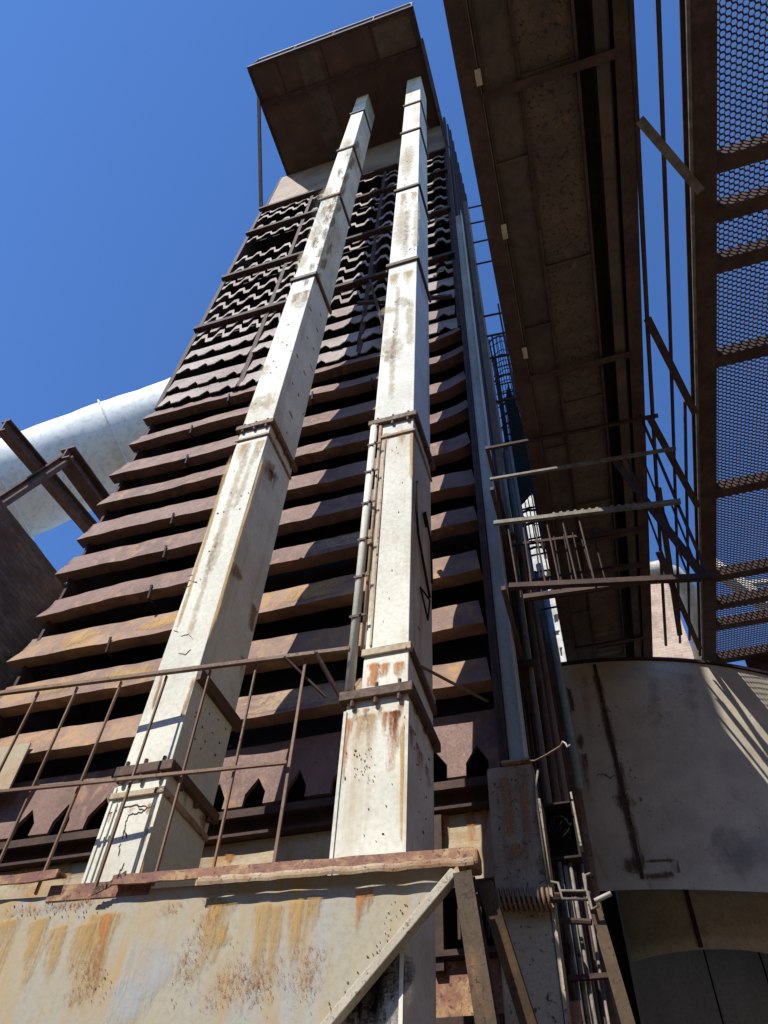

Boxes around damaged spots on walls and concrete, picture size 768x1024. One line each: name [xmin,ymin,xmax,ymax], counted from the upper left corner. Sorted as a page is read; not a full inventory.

rust [367,661,404,685]
rust [343,704,429,837]
crack [103,804,154,874]
rust [0,895,119,1005]
rust [170,896,230,993]
rust [209,896,332,1012]
rust [356,887,374,919]